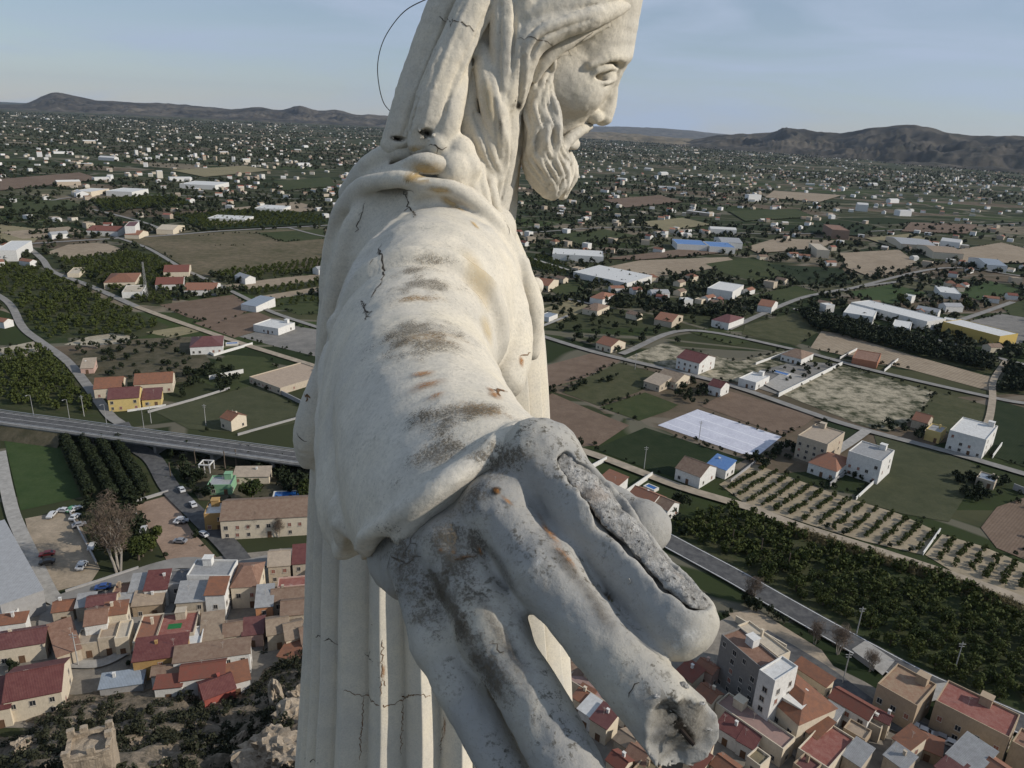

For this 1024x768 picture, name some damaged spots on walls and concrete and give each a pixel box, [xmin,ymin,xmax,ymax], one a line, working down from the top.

crack [360,246,385,319]
water stain [458,403,502,415]
crack [344,644,430,760]
spalling [653,681,713,747]